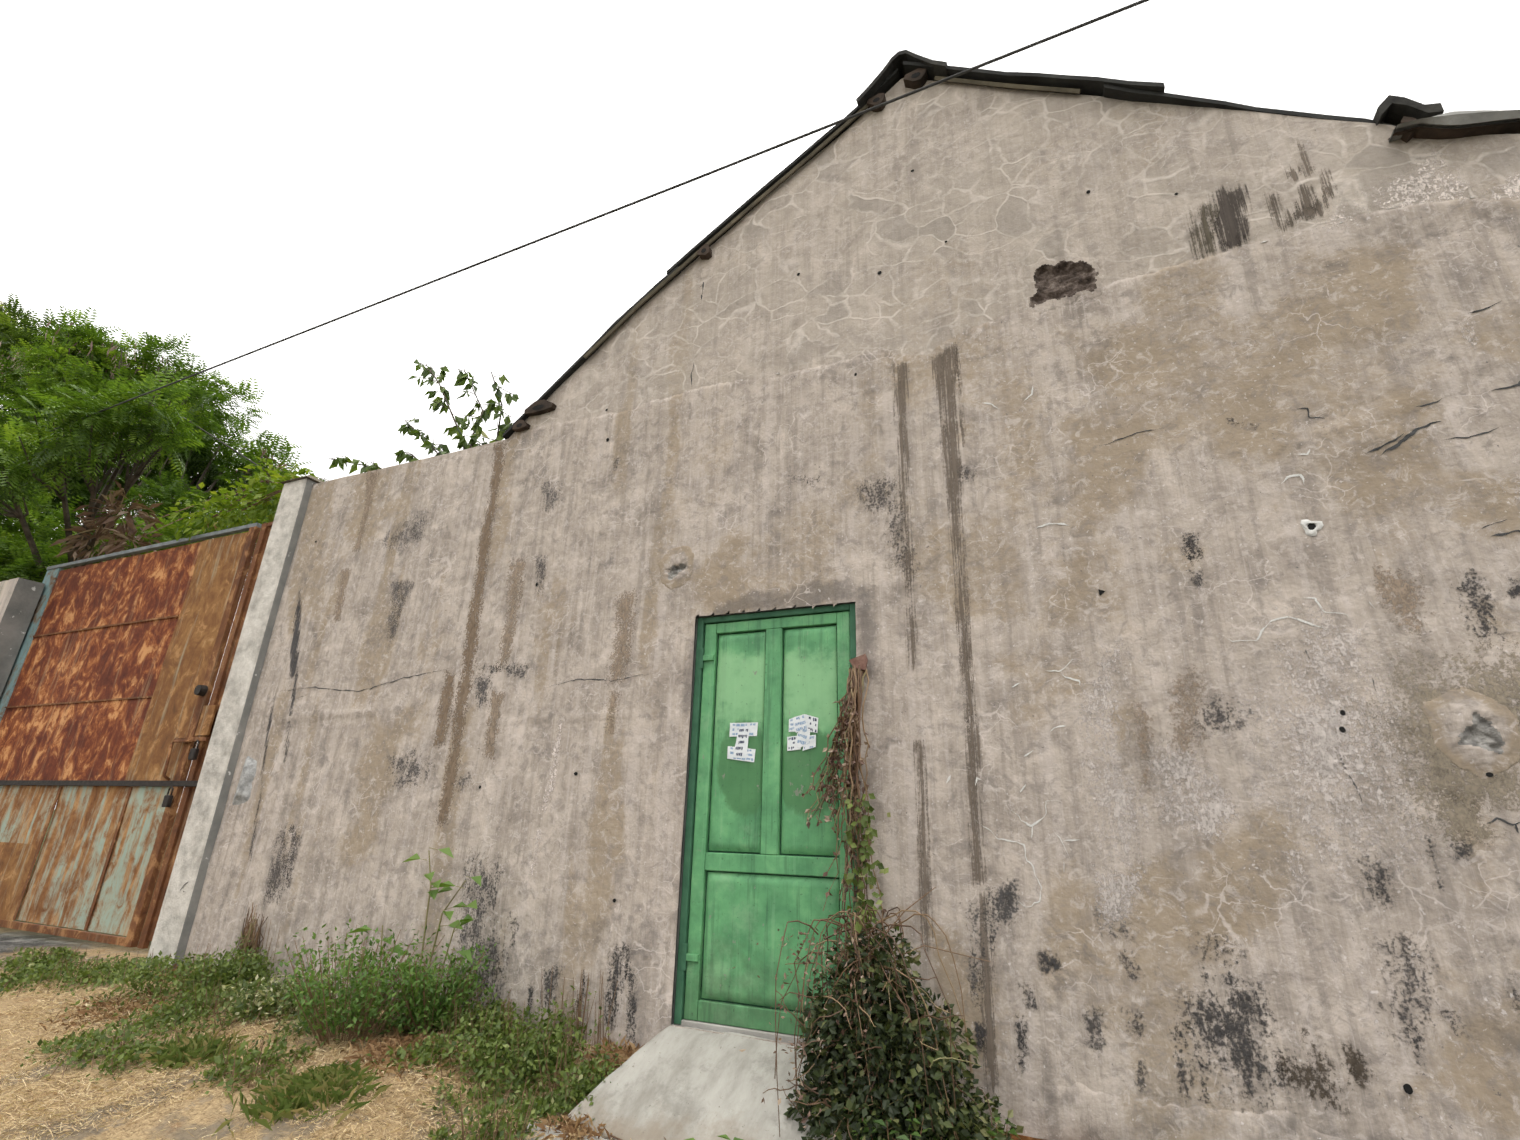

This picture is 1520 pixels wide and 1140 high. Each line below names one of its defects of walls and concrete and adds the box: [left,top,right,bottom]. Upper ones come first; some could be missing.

water stain [1189,144,1471,260]
water stain [1489,174,1520,200]
spalling [1022,249,1107,314]
water stain [860,362,918,669]
water stain [392,442,546,827]
water stain [932,342,1019,1092]
spalling [1422,687,1520,779]
water stain [913,741,933,951]
water stain [1038,951,1061,974]
water stain [1015,984,1037,1071]
mould [1173,936,1372,1110]